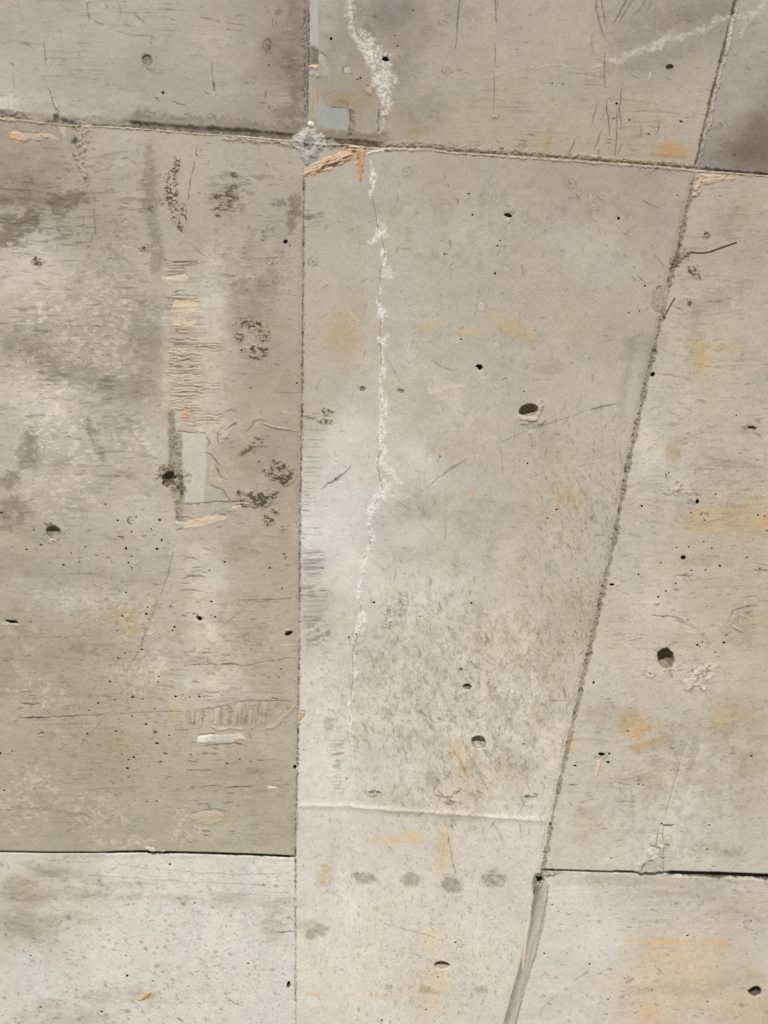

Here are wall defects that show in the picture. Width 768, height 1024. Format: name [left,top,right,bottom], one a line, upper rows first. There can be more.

crack [326,0,407,206]
crack [590,0,768,81]
damp [289,167,417,638]
crack [364,434,404,543]